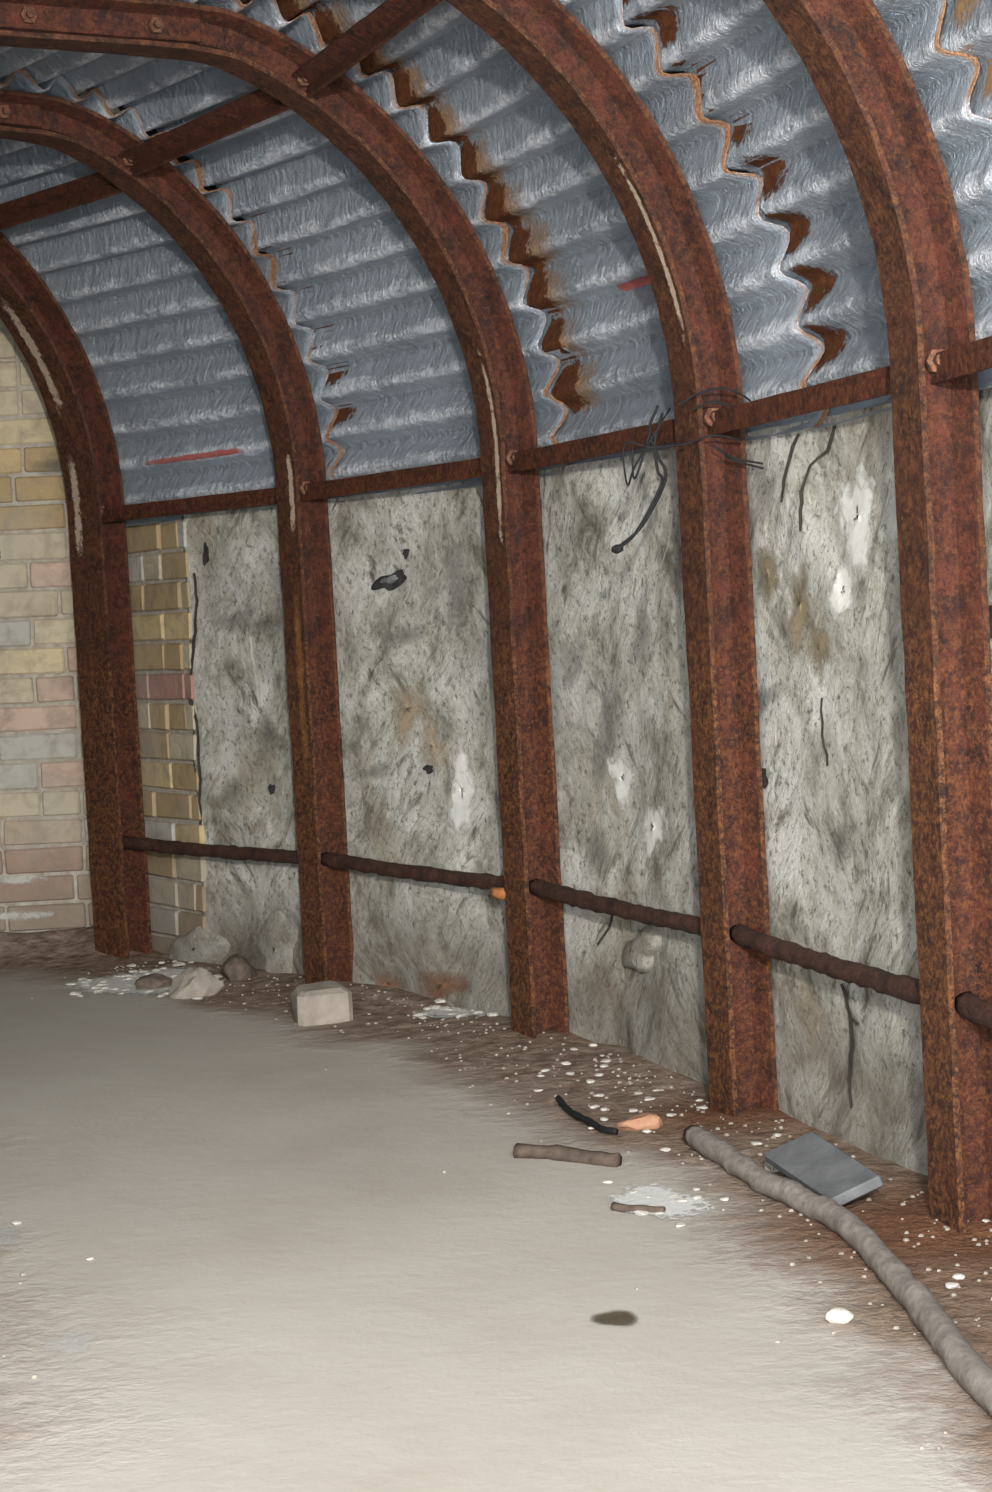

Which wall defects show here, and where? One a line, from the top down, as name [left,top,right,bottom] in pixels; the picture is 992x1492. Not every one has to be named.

corrosion [276,0,353,44]
corrosion [971,46,992,96]
corrosion [359,47,592,414]
corrosion [622,0,848,372]
corrosion [305,317,356,427]